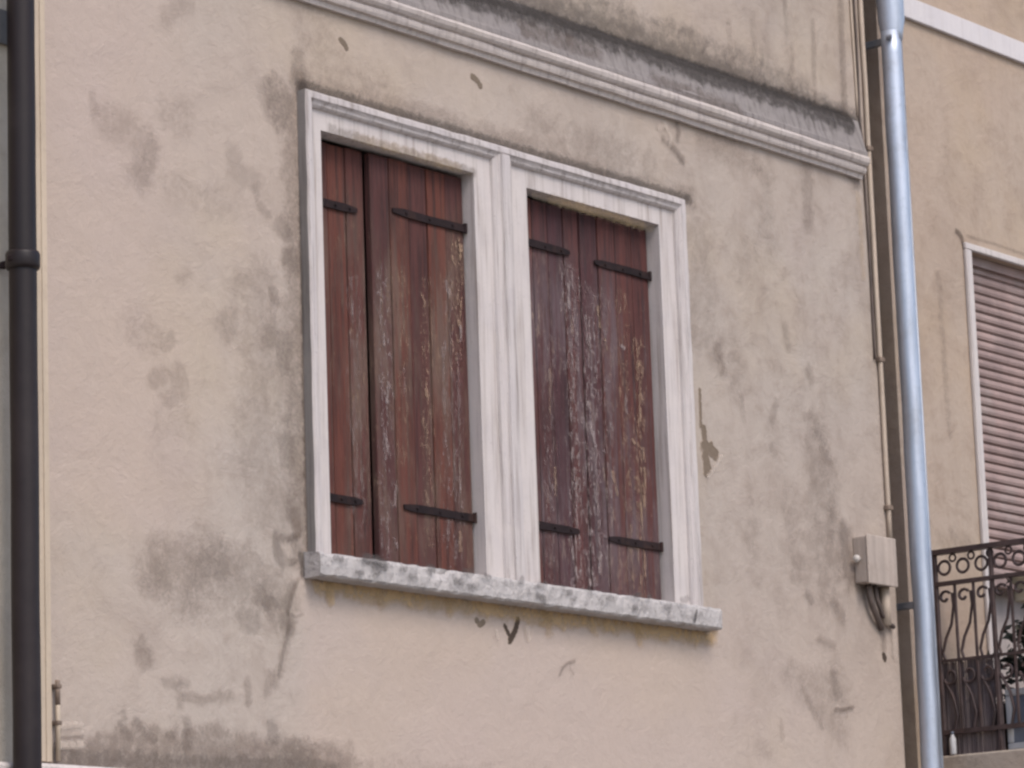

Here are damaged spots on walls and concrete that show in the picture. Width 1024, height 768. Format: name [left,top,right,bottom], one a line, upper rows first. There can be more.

water stain [480,0,852,122]
flaking render [698,387,719,477]